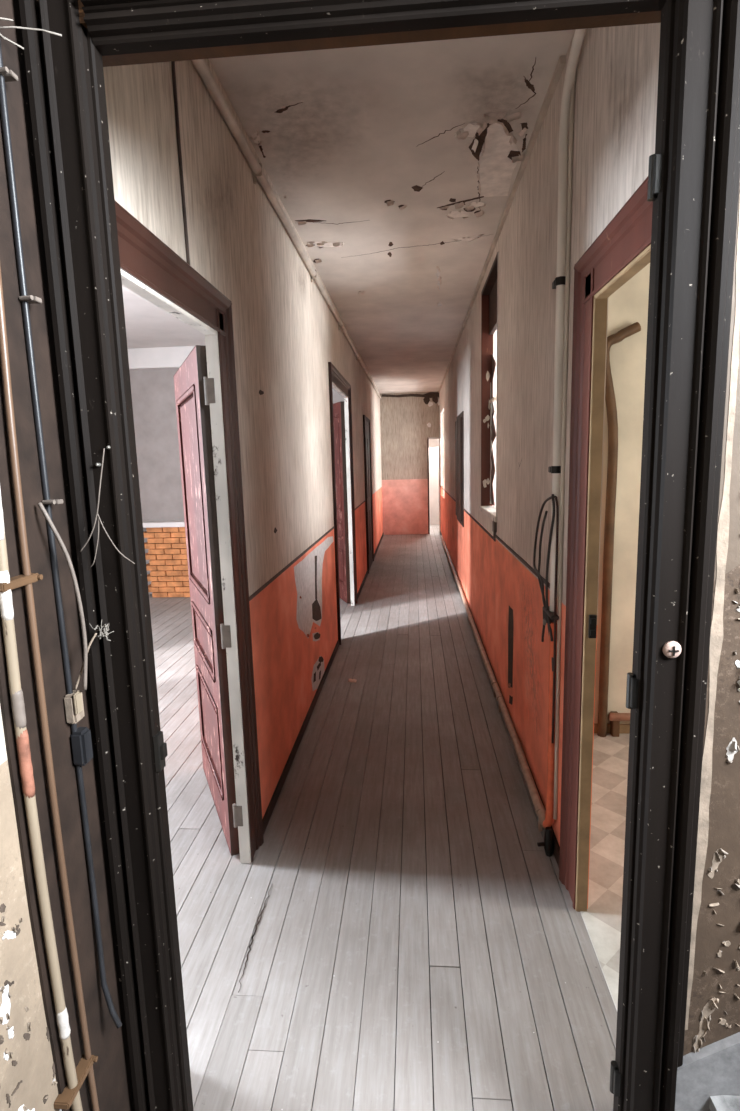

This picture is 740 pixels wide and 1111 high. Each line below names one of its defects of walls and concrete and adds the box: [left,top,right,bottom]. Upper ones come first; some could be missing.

peeling [437,111,528,220]
peeling [294,536,334,641]
peeling [685,194,740,1053]
peeling [311,656,325,691]
peeling [0,903,23,940]
peeling [0,980,31,1066]
peeling [56,1008,71,1040]
peeling [6,1078,57,1111]